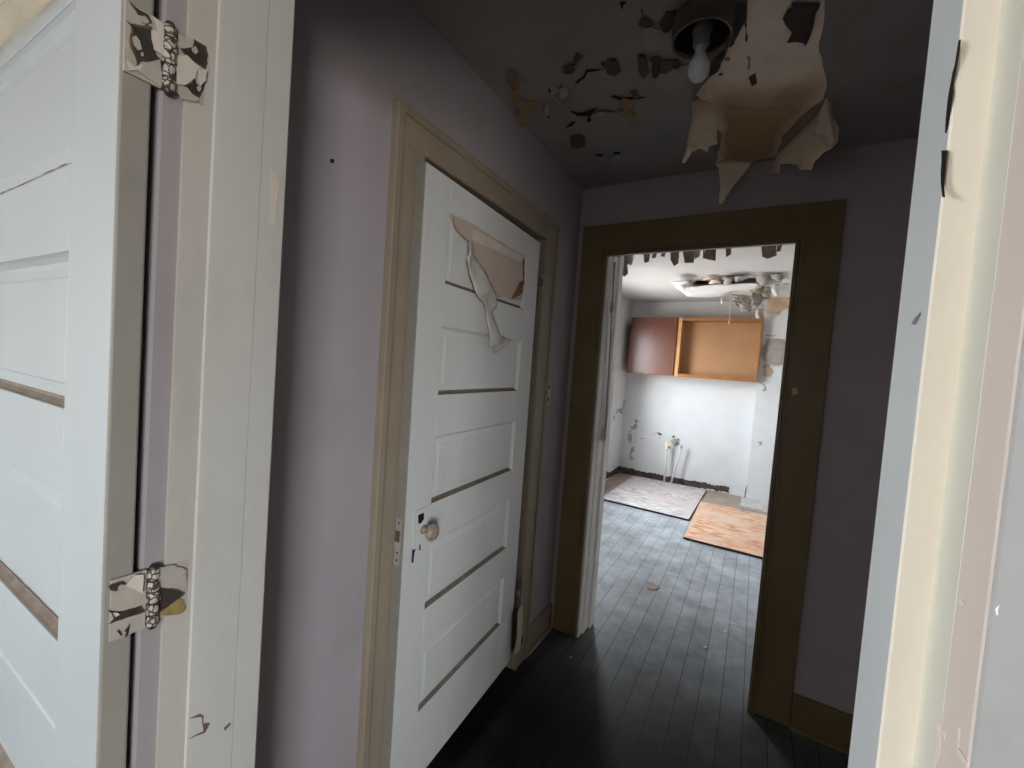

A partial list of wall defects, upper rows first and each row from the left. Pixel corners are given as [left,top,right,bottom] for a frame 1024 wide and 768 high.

peeling [638,9,688,91]
peeling [709,3,747,76]
peeling [506,53,621,127]
peeling [562,90,645,159]
crack [941,40,961,197]
peeling [623,249,731,277]
peeling [761,245,782,259]
spalling [730,286,774,377]